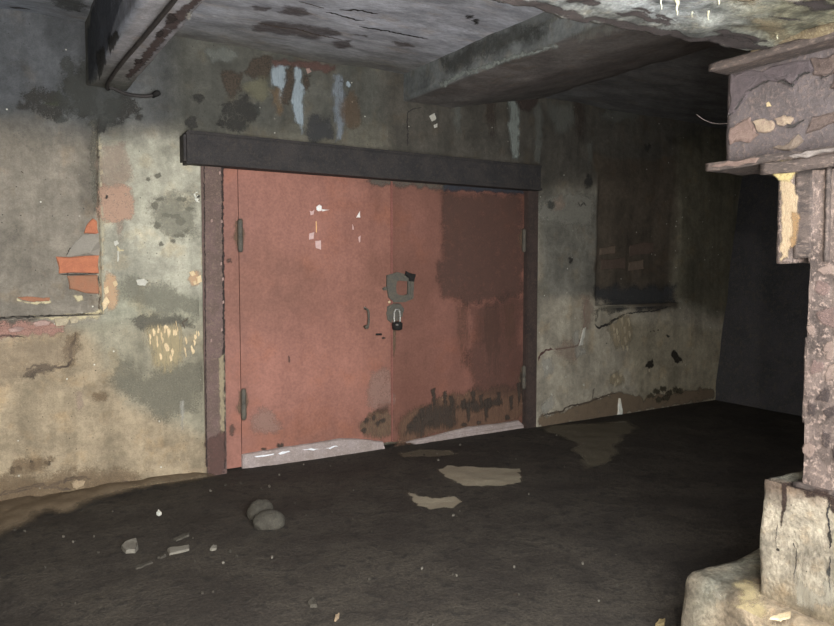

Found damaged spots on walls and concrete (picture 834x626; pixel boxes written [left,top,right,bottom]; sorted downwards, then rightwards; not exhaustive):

leakage [17,0,143,133]
leakage [207,47,361,143]
spalling [56,120,118,314]
crack [23,332,79,378]
crack [538,300,590,361]
rust [360,373,523,446]
crack [775,483,797,581]
crack [825,502,833,590]